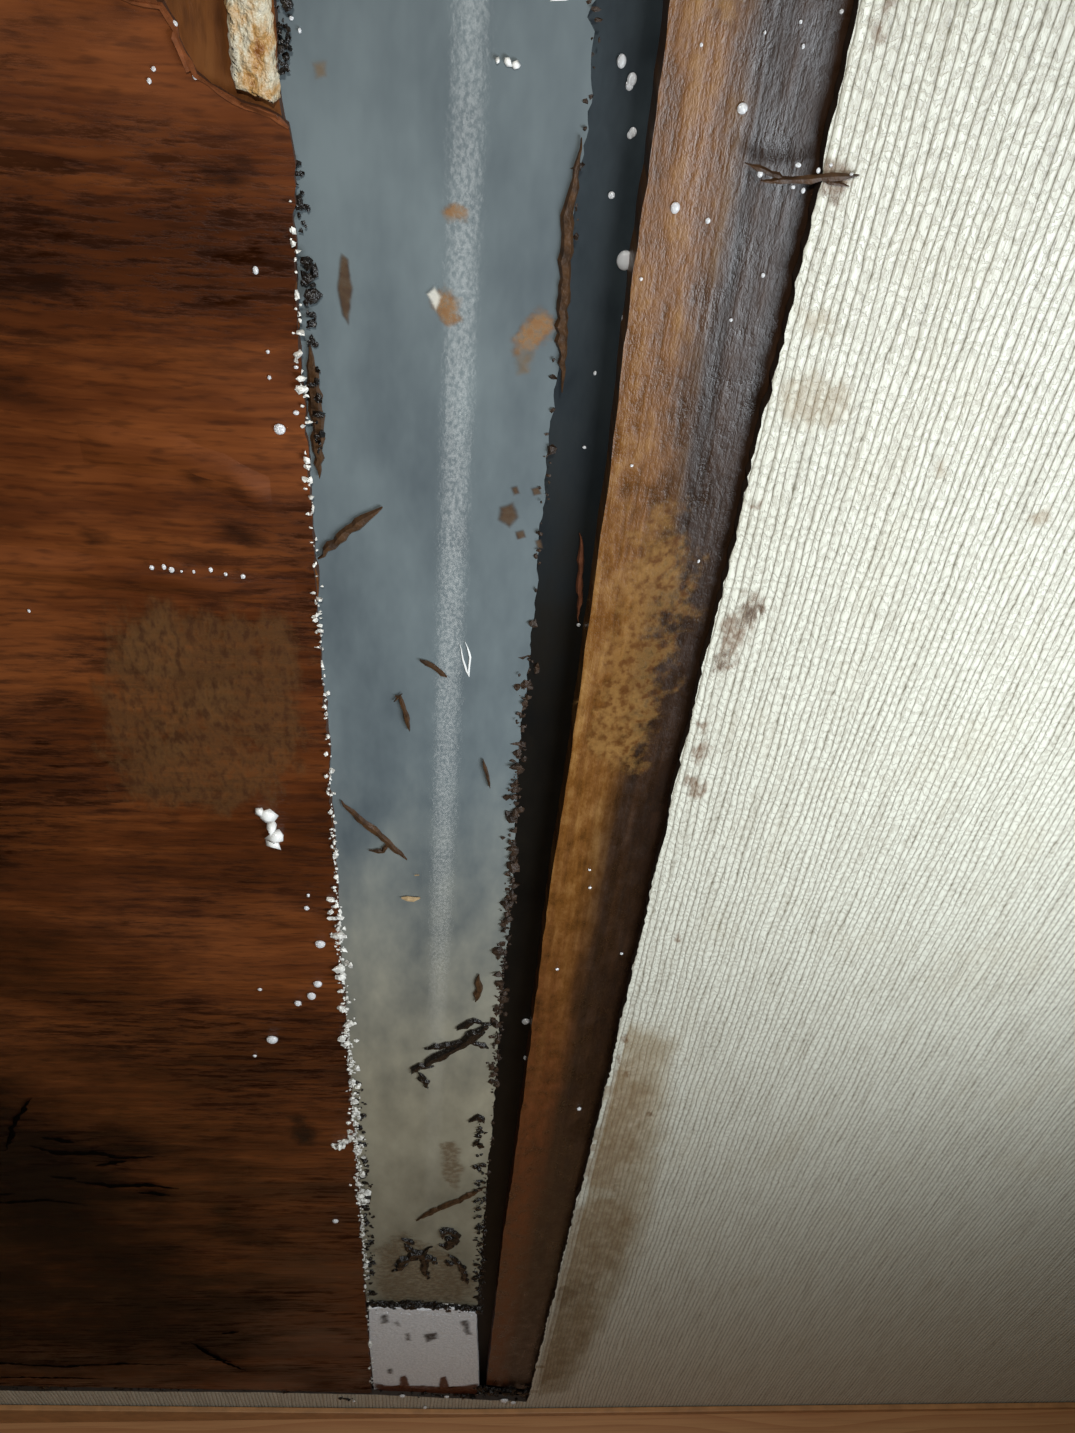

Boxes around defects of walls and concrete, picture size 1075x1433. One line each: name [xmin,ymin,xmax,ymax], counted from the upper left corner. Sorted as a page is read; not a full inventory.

spalling [538,433,557,503]
peeling [593,508,690,765]
spalling [459,654,540,1317]